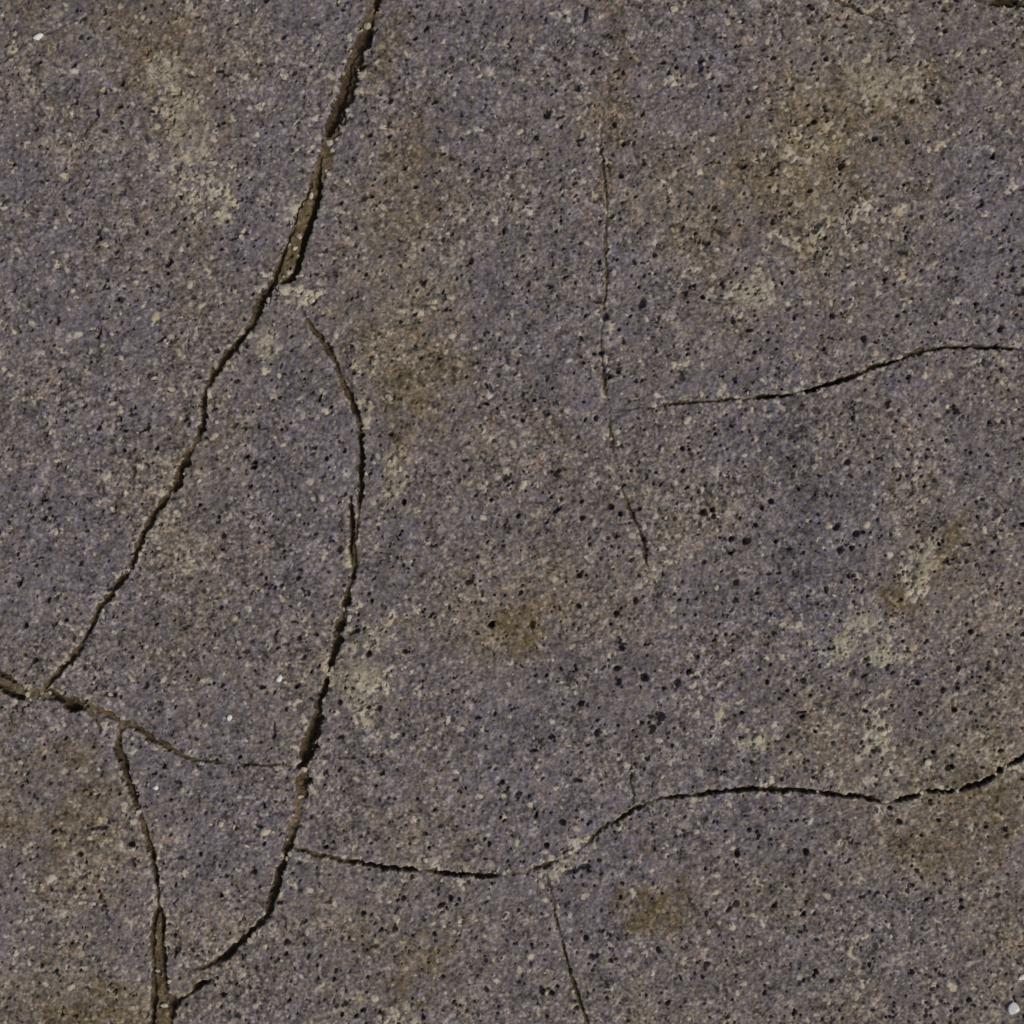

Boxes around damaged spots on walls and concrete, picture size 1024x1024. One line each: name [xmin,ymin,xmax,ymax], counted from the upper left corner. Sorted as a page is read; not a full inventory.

crack [834,0,937,45]
crack [972,0,1024,9]
crack [595,59,1021,623]
crack [0,0,386,1024]
crack [292,718,1024,1024]